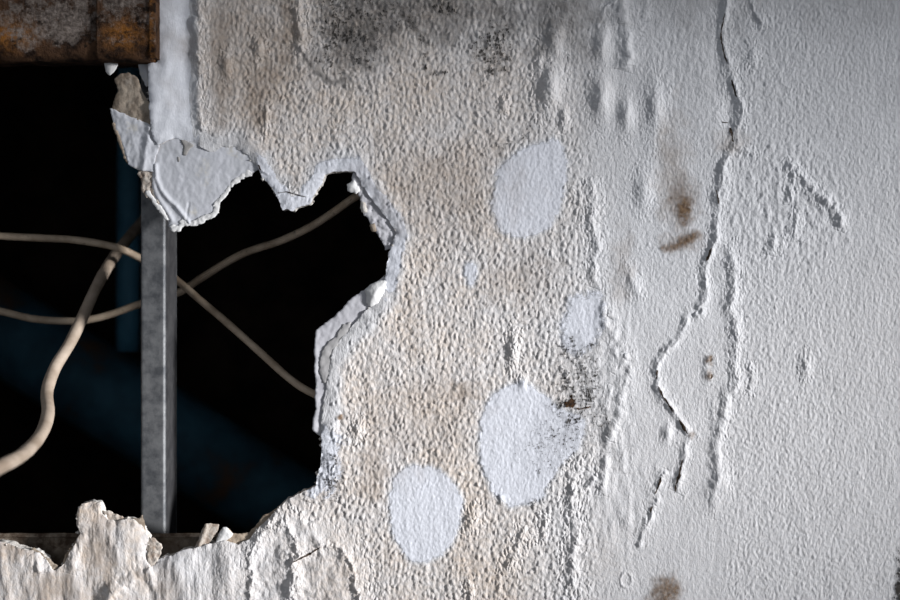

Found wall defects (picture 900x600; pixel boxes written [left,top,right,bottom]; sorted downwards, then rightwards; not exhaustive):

peeling [138,0,218,152]
flaking render [137,170,169,220]
peeling [249,154,408,302]
rust [661,197,698,250]
crack [632,0,852,547]
peeling [274,424,344,512]
spalling [0,539,63,571]
spalling [75,499,152,545]
flaking render [159,523,243,559]